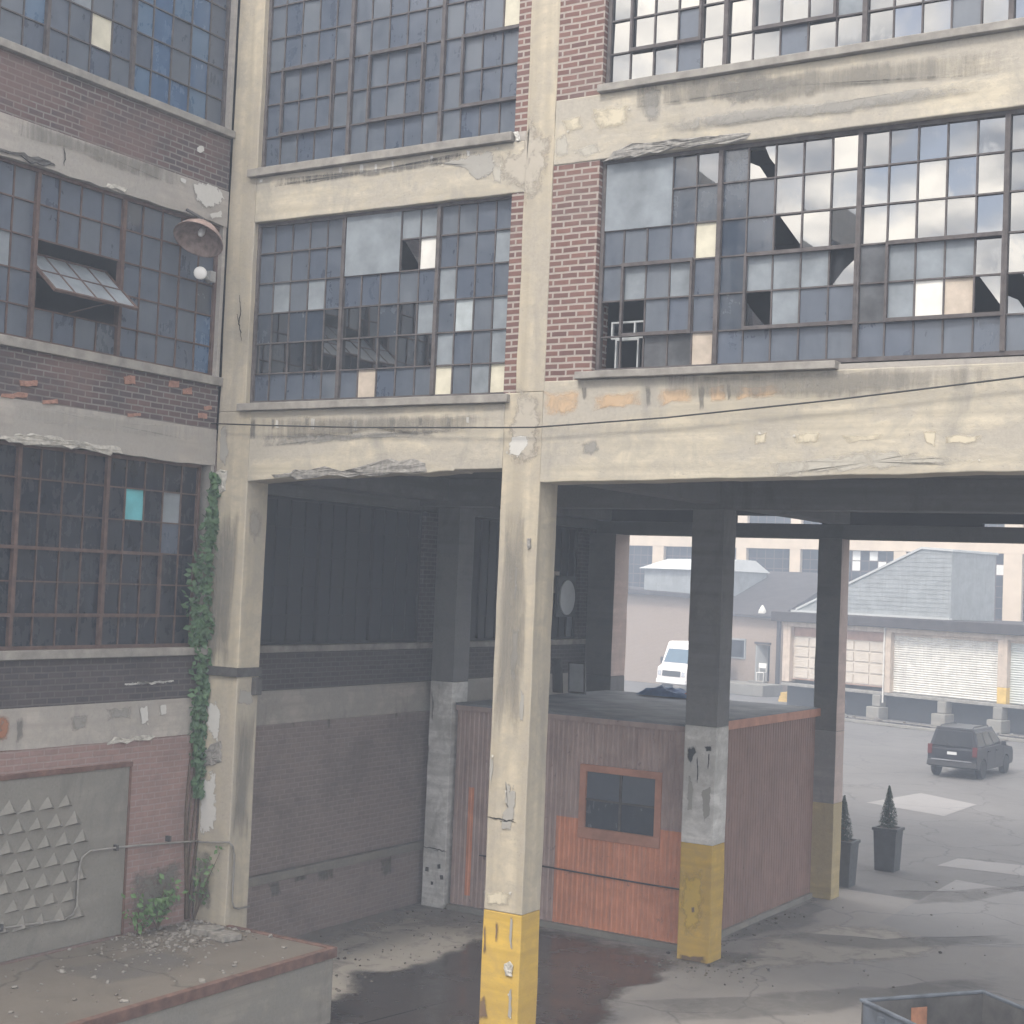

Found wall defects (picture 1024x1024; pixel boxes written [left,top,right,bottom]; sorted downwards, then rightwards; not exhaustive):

water stain [643,60,958,128]
peeling [437,148,501,182]
peeling [181,178,225,219]
peeling [506,432,532,457]
spalling [107,705,167,745]
peeling [198,702,222,835]
peeling [687,776,711,819]